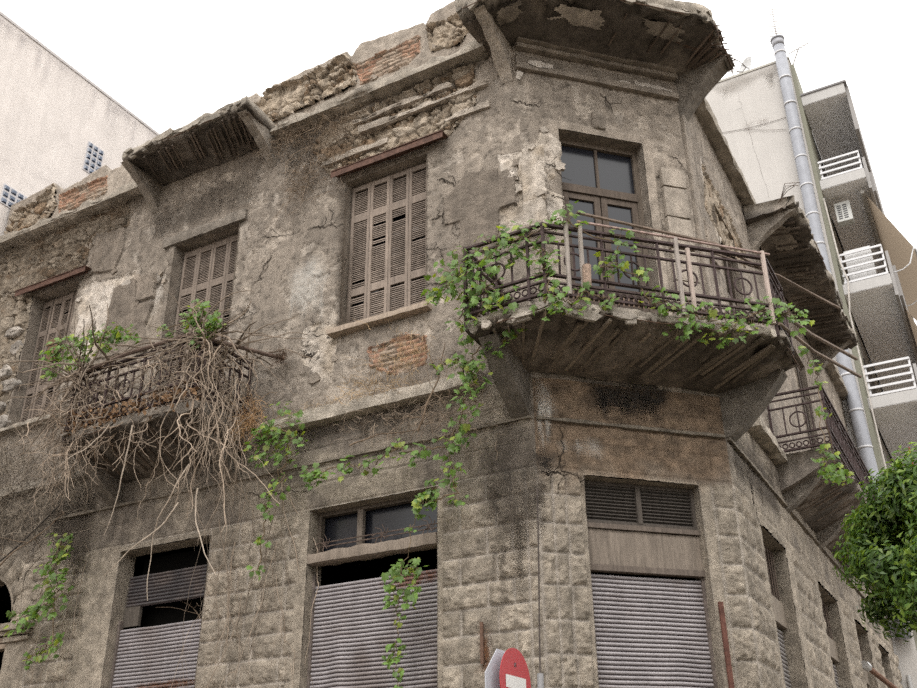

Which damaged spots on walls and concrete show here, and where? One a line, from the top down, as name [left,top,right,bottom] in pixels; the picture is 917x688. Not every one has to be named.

spalling [254,0,486,122]
peeling [516,60,553,79]
peeling [547,4,605,30]
peeling [620,0,746,71]
spalling [124,101,241,159]
spalling [311,63,478,175]
spalling [4,175,108,234]
peeling [442,126,566,283]
spalling [0,203,168,428]
spalling [367,332,428,375]
damp [593,384,666,413]
crack [542,429,589,496]